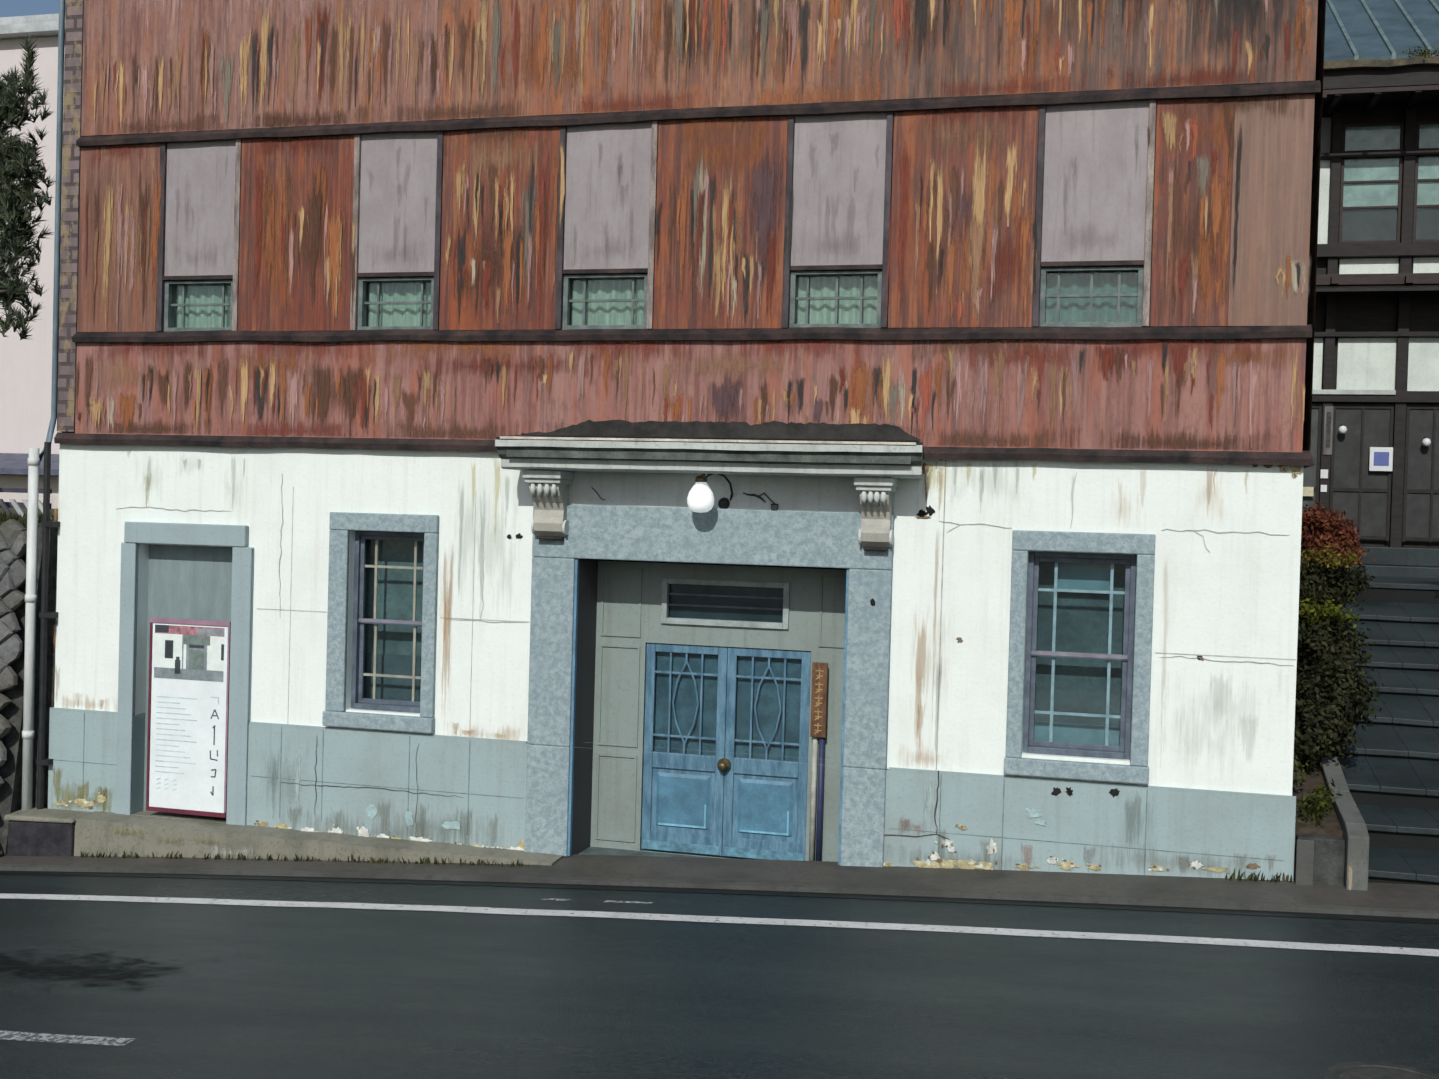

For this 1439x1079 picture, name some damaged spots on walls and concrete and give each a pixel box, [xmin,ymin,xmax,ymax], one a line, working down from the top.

rust [93,0,1312,325]
rust [75,176,1305,450]
crack [1161,529,1280,552]
crack [1159,656,1294,666]
spalling [52,792,107,809]
crack [884,771,949,840]
spalling [911,824,997,870]
spalling [1015,856,1101,871]